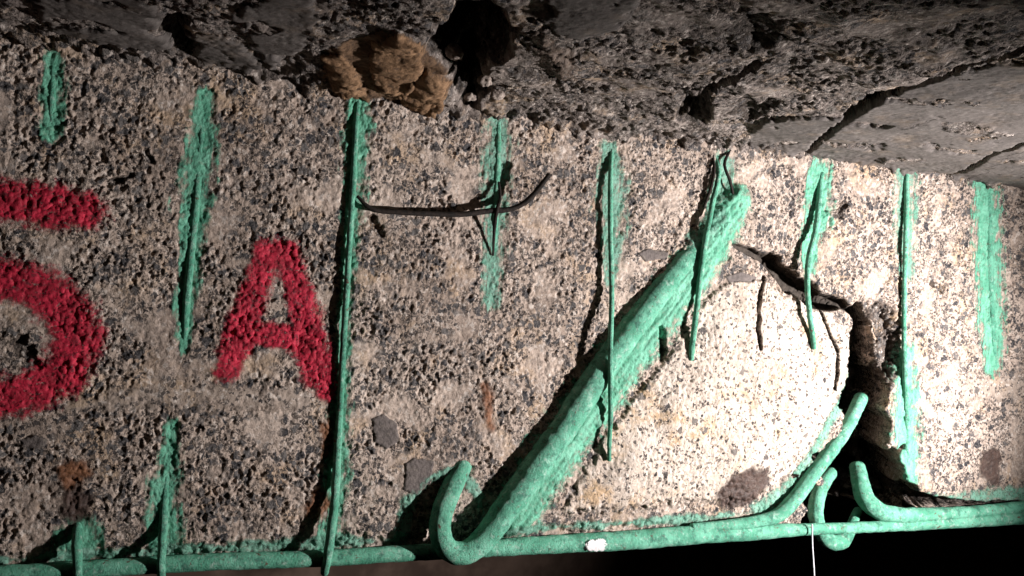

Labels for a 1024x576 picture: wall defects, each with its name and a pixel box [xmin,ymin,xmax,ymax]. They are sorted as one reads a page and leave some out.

spalling [833,199,849,220]
flaking render [639,249,669,262]
flaking render [725,272,756,282]
spalling [827,296,1018,506]